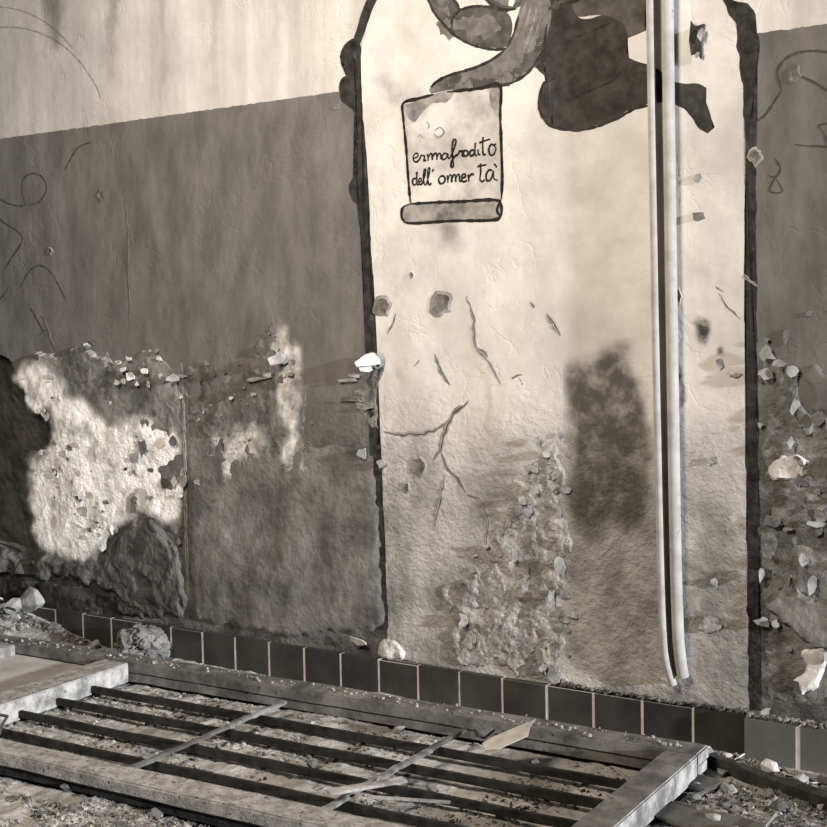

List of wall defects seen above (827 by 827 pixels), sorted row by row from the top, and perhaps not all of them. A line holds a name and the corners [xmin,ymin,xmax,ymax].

peeling [0,321,313,619]
peeling [338,352,385,429]
crack [414,354,450,385]
crack [383,401,491,557]
spalling [441,432,578,686]
peeling [753,338,827,718]